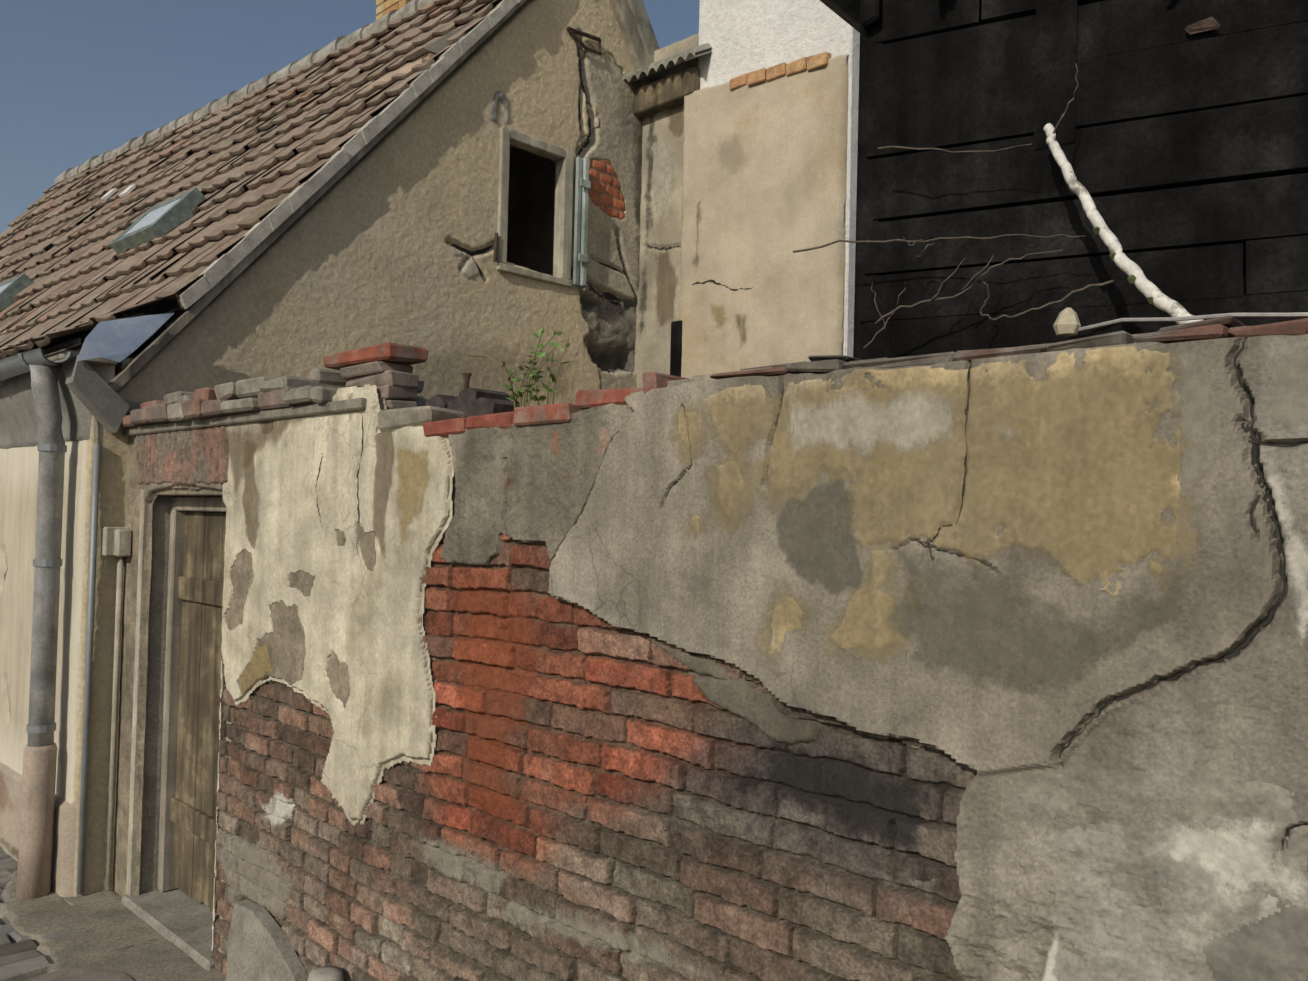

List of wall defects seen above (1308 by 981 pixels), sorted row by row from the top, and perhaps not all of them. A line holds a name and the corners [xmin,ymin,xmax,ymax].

crack [576,41,591,155]
flaking render [589,159,625,220]
crack [446,241,492,278]
spalling [571,271,637,373]
crack [894,365,997,572]
crack [1059,341,1308,764]
spalling [211,346,1308,981]
crack [1281,823,1308,851]